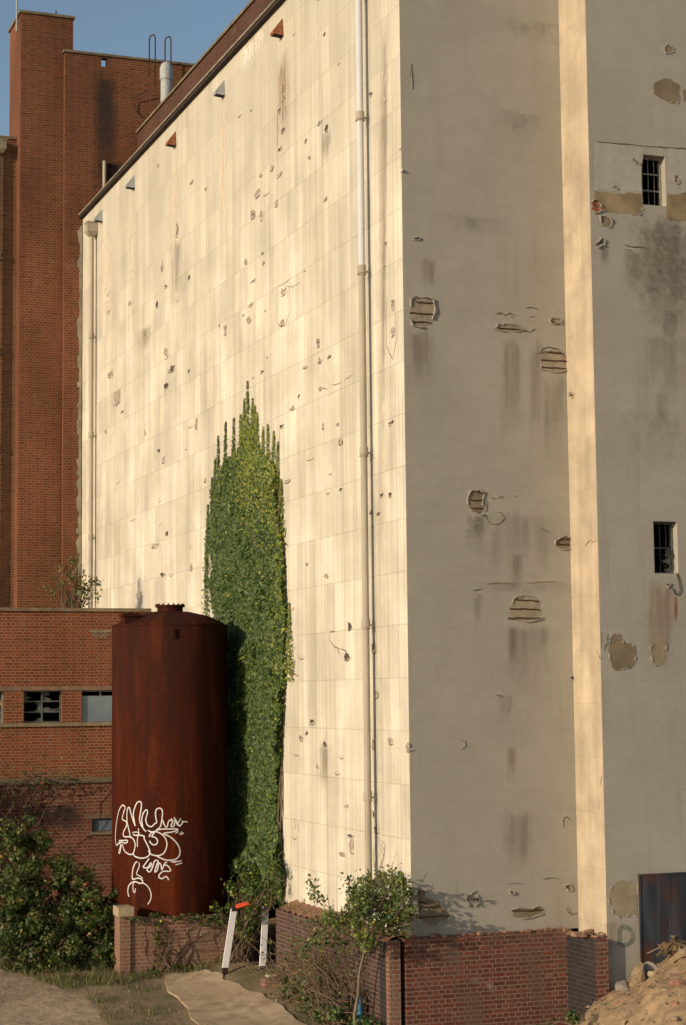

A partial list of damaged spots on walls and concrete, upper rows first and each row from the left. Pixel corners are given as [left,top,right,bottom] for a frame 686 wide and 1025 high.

peeling [653,78,686,104]
peeling [666,175,686,222]
peeling [592,185,644,248]
spalling [409,296,436,328]
spalling [540,349,567,373]
spalling [467,489,486,516]
spalling [554,536,571,550]
spalling [508,594,542,622]
peeling [608,633,636,671]
spalling [416,889,452,937]
spalling [461,905,606,937]
peeling [608,880,639,918]